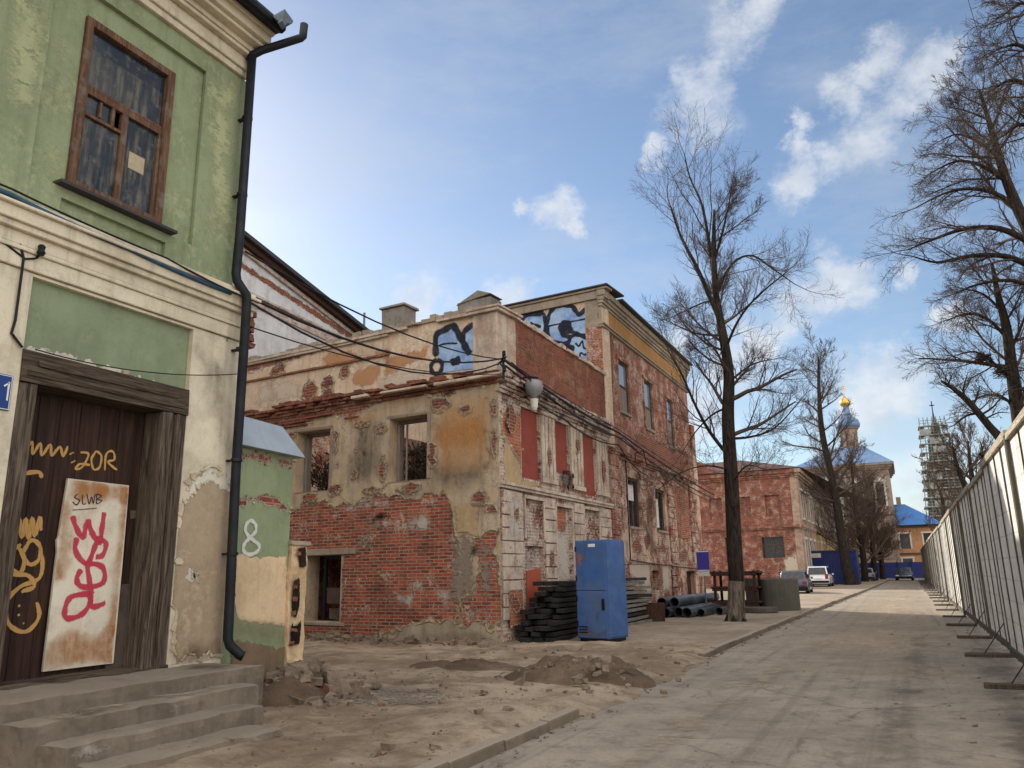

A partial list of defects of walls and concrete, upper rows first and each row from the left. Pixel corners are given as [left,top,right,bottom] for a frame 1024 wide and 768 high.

flaking render [170,402,525,665]
flaking render [557,508,566,532]